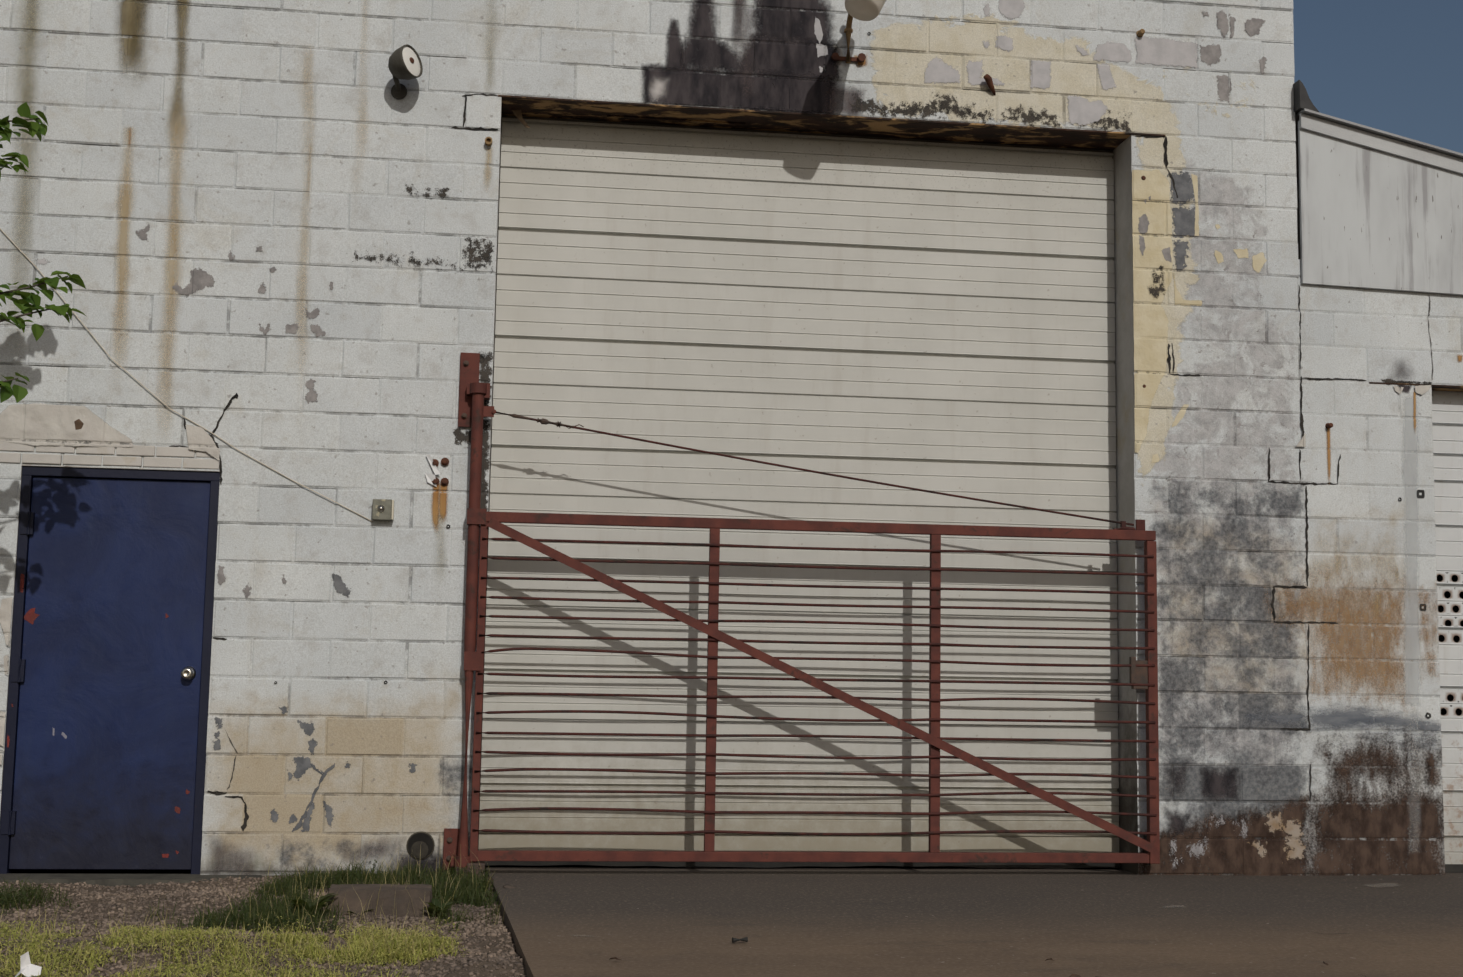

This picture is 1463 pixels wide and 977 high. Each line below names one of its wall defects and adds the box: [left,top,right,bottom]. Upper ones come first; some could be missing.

damp [120,0,145,62]
damp [173,0,188,132]
damp [642,0,1132,132]
peeling [1199,10,1265,103]
peeling [1132,169,1221,463]
corrosion [432,484,447,528]
crack [1268,286,1366,731]
peeling [279,706,324,782]
damp [1247,708,1441,746]
peeling [269,798,334,832]
mould [1171,767,1237,799]
peeling [1169,811,1306,867]